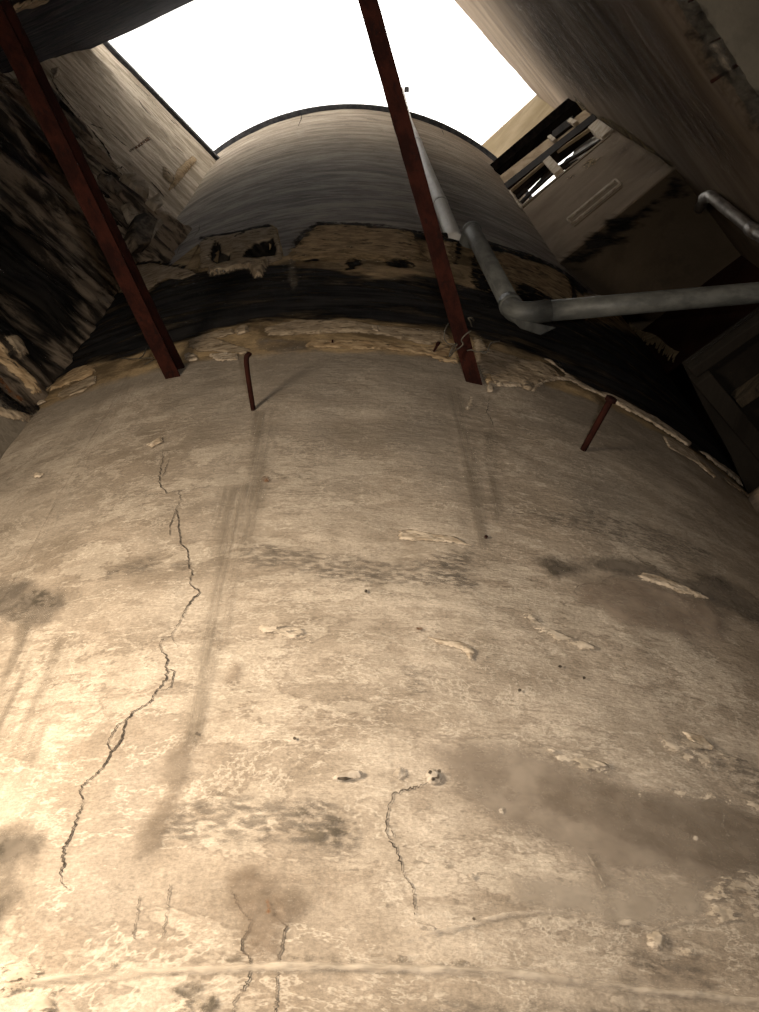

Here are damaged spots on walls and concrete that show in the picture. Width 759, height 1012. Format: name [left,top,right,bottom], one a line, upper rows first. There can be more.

flaking render [136,224,427,290]
flaking render [0,335,96,405]
flaking render [184,320,460,364]
flaking render [0,407,32,422]
flaking render [465,337,749,498]
crack [59,452,211,888]
leakage [0,831,38,909]
crack [384,783,427,915]
crack [230,886,288,1012]